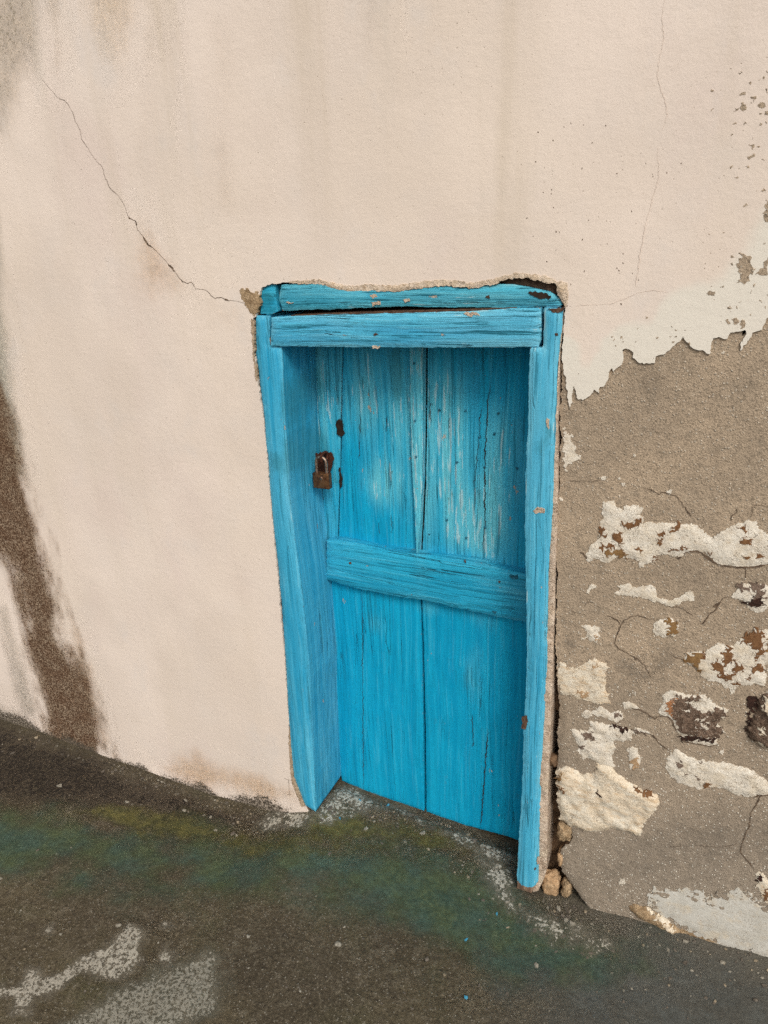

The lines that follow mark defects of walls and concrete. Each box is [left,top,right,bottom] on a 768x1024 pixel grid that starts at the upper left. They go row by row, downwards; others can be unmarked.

peeling [731,70,768,135]
crack [40,75,242,303]
peeling [731,252,768,286]
crack [571,604,651,677]
peeling [546,300,768,957]
leakage [0,341,630,1018]
crack [676,795,768,869]
peeling [452,833,514,916]
peeling [529,916,614,956]